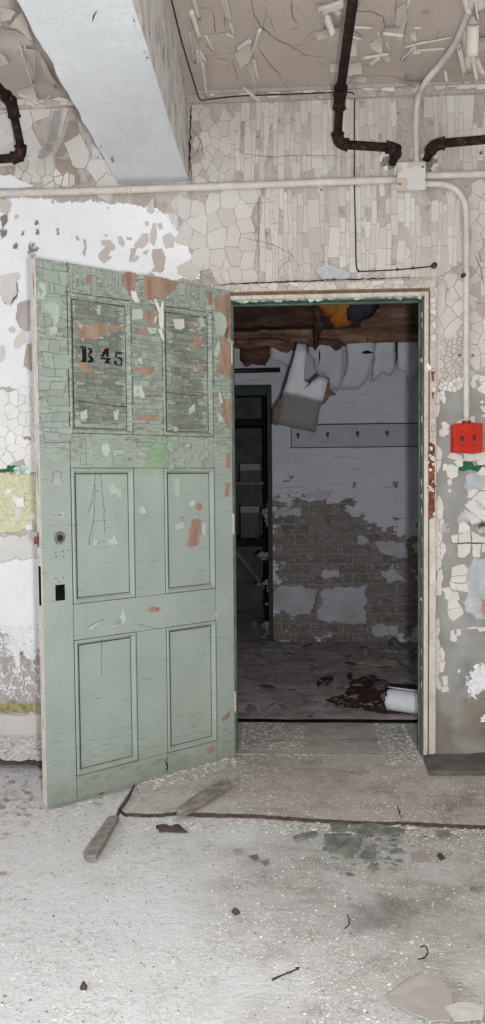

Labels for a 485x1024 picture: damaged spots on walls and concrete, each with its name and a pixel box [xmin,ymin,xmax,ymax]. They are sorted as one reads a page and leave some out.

flaking render [0,0,485,434]
crack [0,106,485,477]
spalling [257,356,485,754]